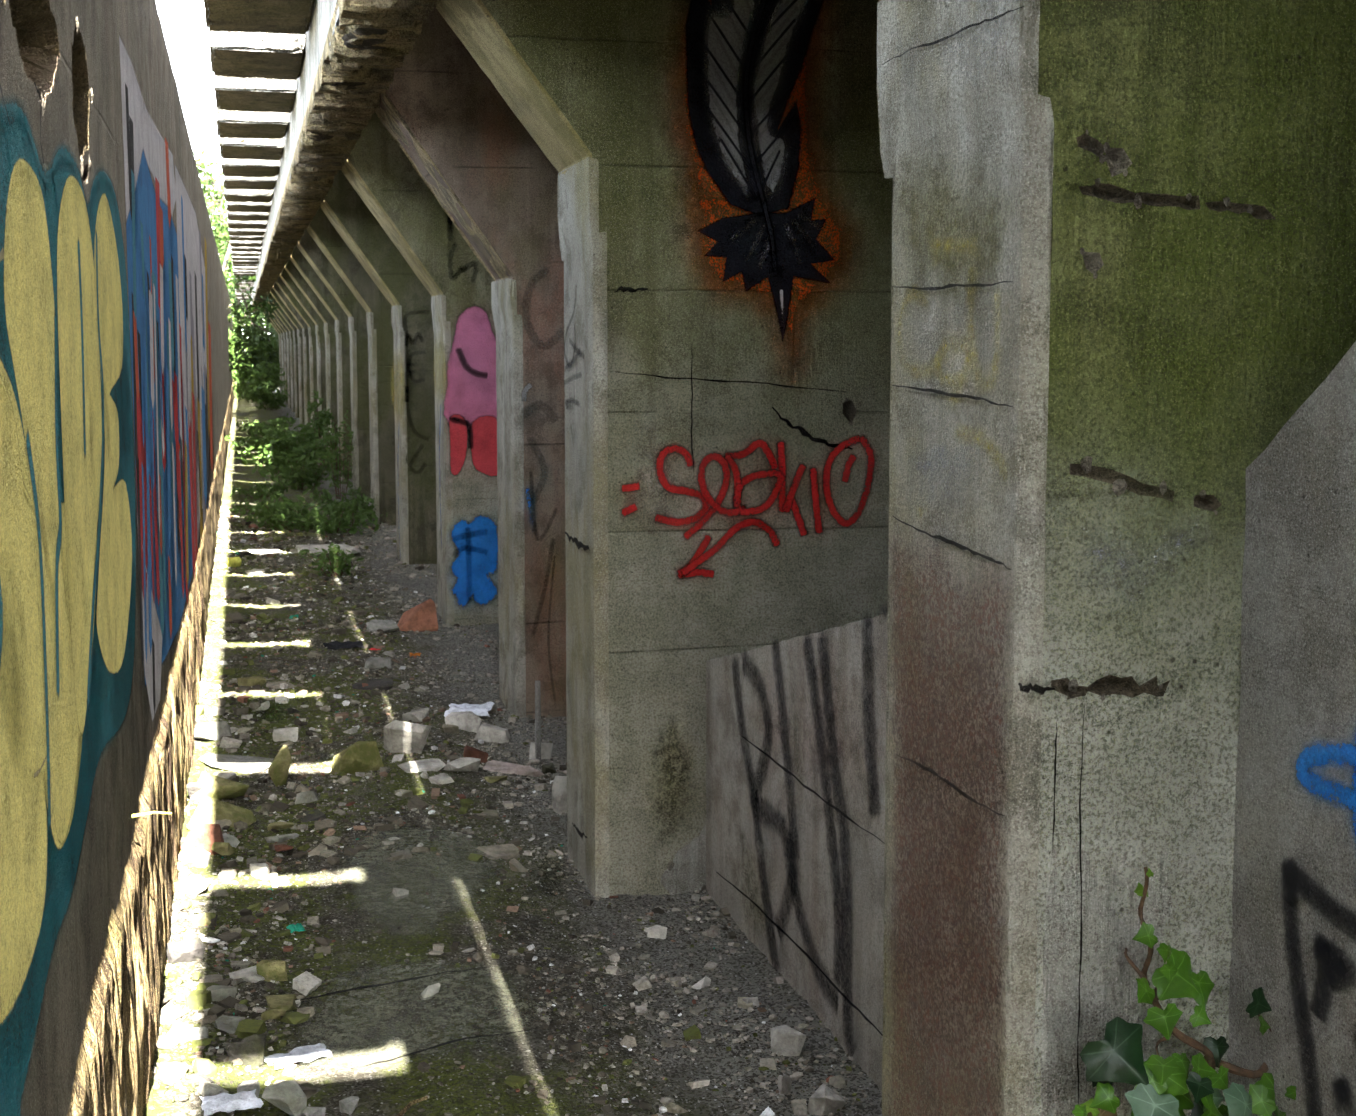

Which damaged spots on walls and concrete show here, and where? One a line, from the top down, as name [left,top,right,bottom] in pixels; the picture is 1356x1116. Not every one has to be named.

spalling [341,28,387,56]
crack [882,6,1024,65]
spalling [1,0,93,186]
spalling [333,82,366,95]
spalling [310,127,333,143]
spalling [1076,129,1276,220]
crack [618,363,853,472]
spalling [1069,456,1175,502]
spalling [1194,490,1222,515]
spalling [1018,675,1170,701]